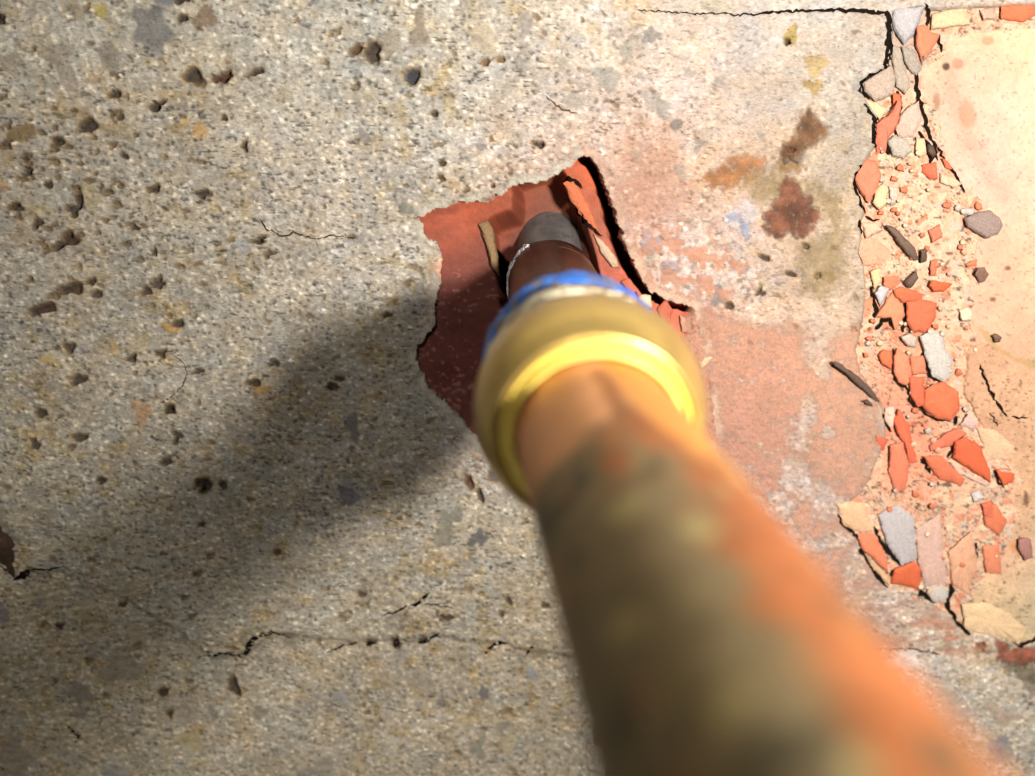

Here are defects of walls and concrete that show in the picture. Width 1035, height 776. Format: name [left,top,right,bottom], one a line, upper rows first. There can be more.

spalling [414,200,449,241]
spalling [465,193,482,202]
spalling [499,147,620,268]
spalling [408,272,480,451]
spalling [622,247,724,435]
spalling [833,5,1035,645]
rust [0,526,16,579]
crack [0,565,60,581]
crack [381,592,452,617]
crack [199,629,291,658]
crack [327,633,439,652]
crack [485,641,534,655]